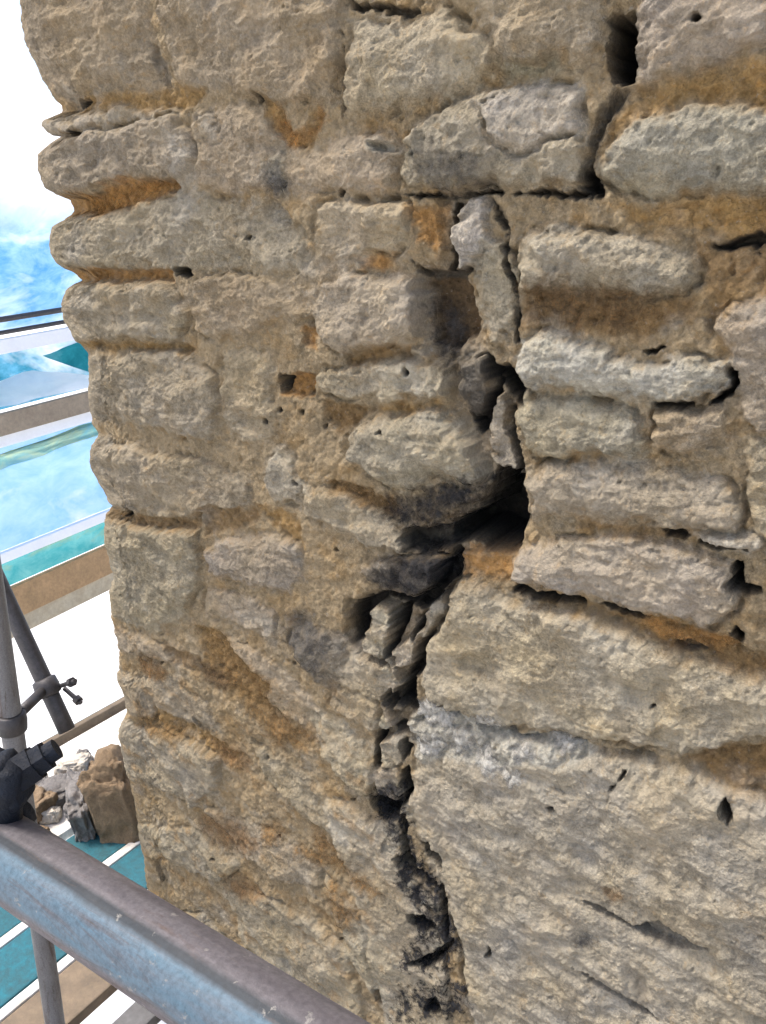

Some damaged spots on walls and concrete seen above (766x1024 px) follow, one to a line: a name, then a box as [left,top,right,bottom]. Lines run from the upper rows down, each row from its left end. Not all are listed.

crack [394,84,633,281]
crack [348,350,532,971]
water stain [371,780,470,1024]
crack [423,997,443,1018]